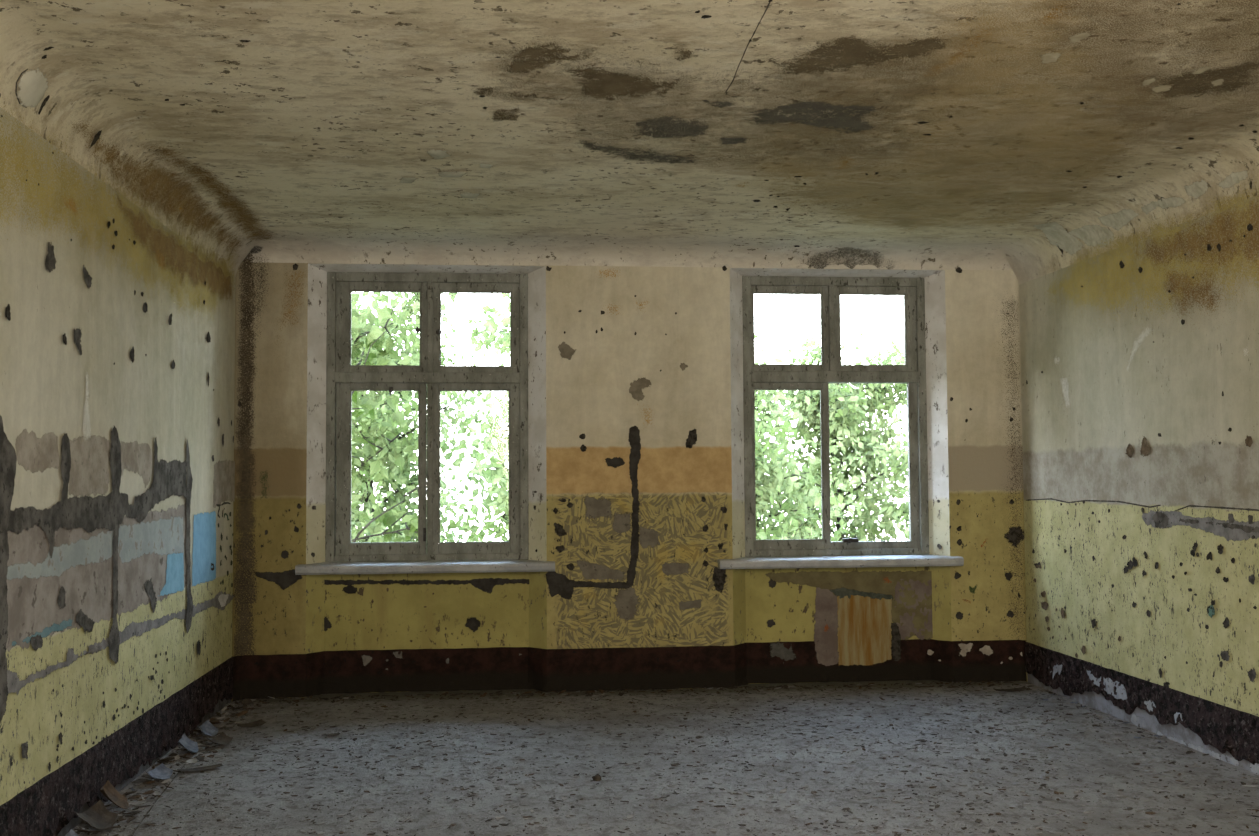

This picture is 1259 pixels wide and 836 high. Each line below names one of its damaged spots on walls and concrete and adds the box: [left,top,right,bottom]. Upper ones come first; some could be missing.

crack [725,2,770,93]
damp [460,0,1259,373]
damp [0,103,312,656]
peeling [6,417,235,695]
peeling [553,496,660,620]
peeling [661,507,728,593]
peeling [1123,551,1159,576]
peeling [1141,507,1259,612]
peeling [765,570,941,666]
peeling [958,643,1022,664]
peeling [1086,670,1127,700]
peeling [1131,700,1259,775]